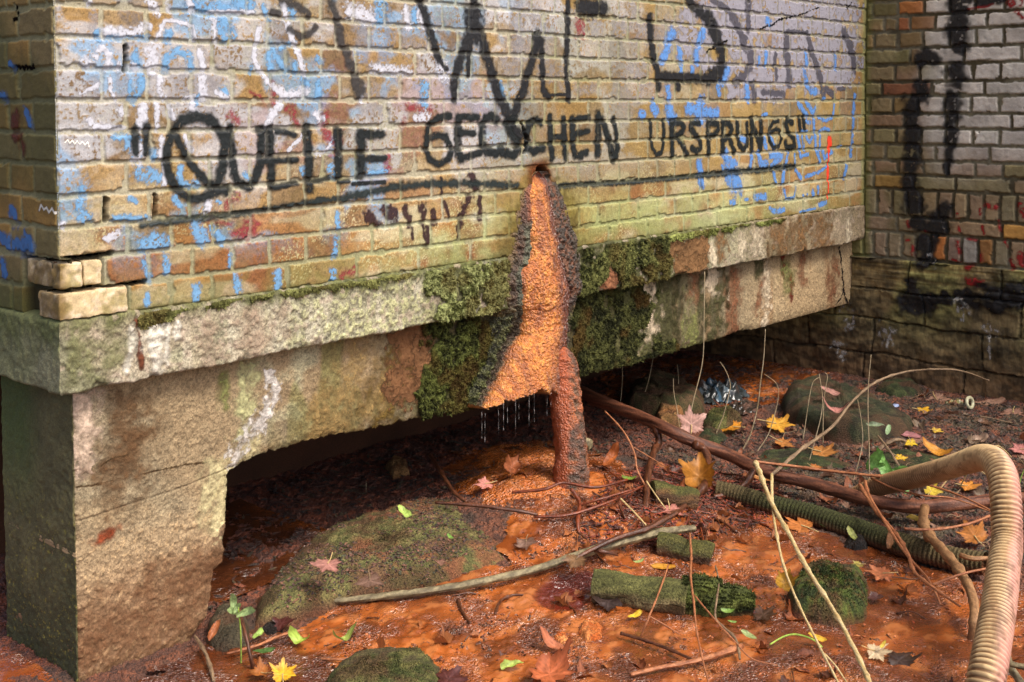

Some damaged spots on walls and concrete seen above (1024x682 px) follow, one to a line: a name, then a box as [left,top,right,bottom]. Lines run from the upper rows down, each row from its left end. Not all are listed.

rust [529,162,553,184]
crack [837,246,849,303]
crack [76,454,218,488]